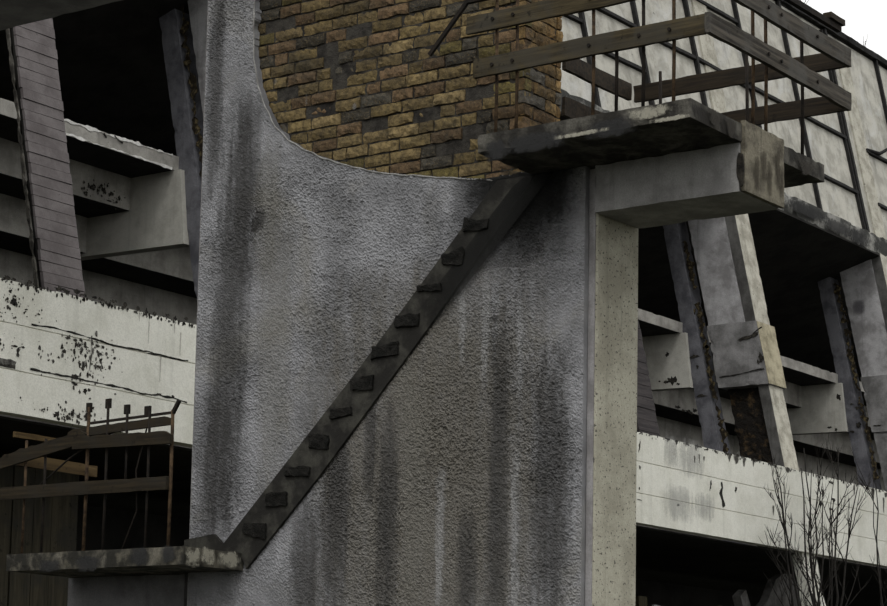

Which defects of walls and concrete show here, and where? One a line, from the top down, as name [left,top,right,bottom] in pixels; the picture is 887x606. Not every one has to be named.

spalling [682,241,697,289]
spalling [0,275,195,328]
spalling [0,333,25,369]
crack [31,323,188,361]
peeling [34,331,120,426]
crack [30,368,187,403]
spalling [638,283,887,511]